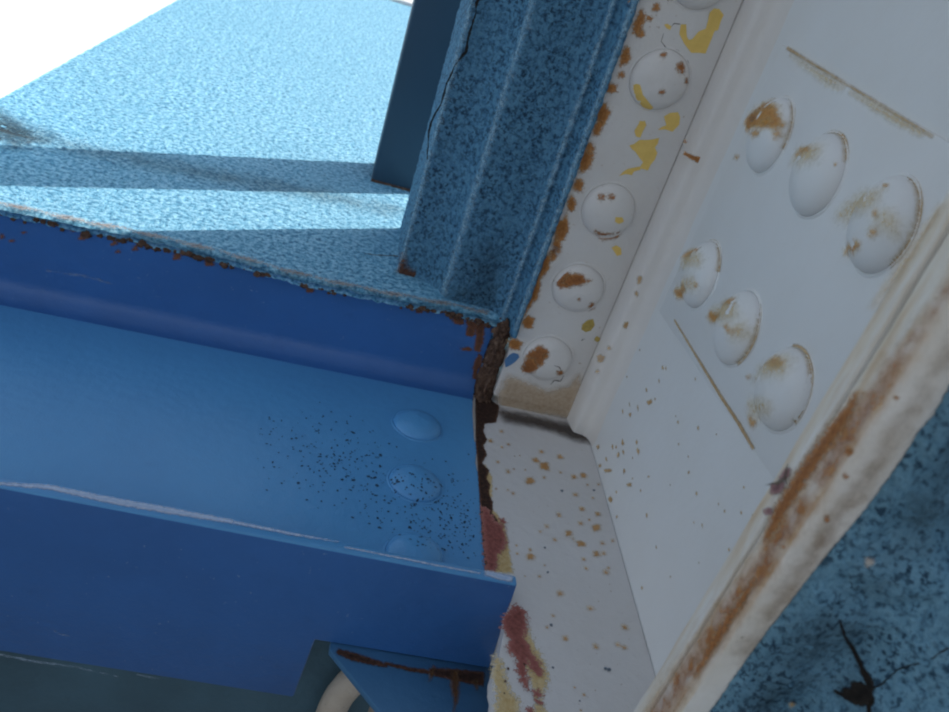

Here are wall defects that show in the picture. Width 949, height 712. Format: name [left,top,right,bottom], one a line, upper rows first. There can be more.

rust [632,3,660,38]
rust [745,99,795,148]
rust [522,46,631,329]
rust [0,214,271,278]
rust [298,283,347,297]
rust [395,253,416,277]
rust [674,320,755,449]
rust [400,304,549,570]
rust [652,360,900,712]
rust [336,649,485,706]
peeling [490,603,551,712]
crack [833,620,949,712]